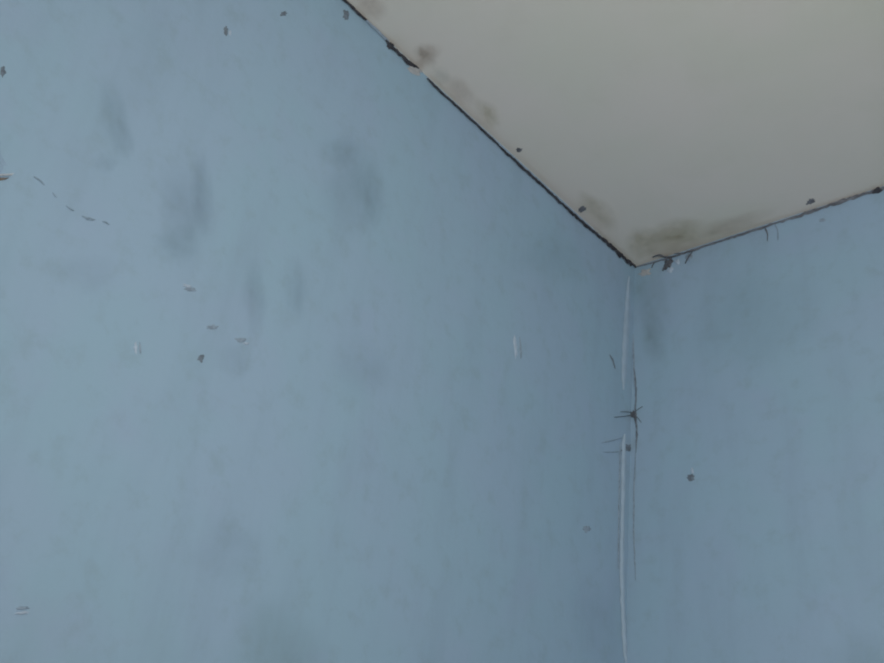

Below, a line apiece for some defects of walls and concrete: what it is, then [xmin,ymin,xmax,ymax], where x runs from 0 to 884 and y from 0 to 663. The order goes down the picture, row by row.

crack [343,0,884,663]